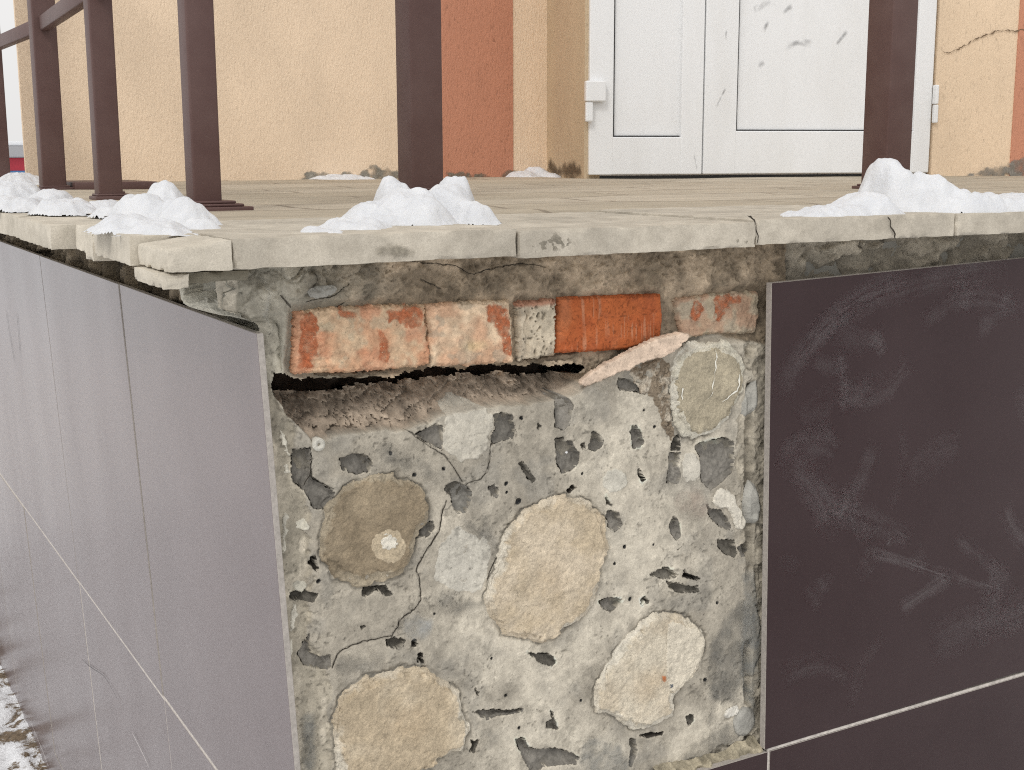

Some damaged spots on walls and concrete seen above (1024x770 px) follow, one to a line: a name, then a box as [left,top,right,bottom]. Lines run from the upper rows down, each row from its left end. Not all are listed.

crack [943,29,1024,53]
peeling [578,331,689,484]
spalling [491,413,517,443]
spalling [540,387,604,473]
spalling [695,438,735,490]
spalling [707,505,747,557]
crack [332,428,492,668]
spalling [362,585,392,596]
spalling [650,567,700,593]
spalling [528,652,555,667]
spalling [477,708,523,720]
spalling [516,737,580,770]